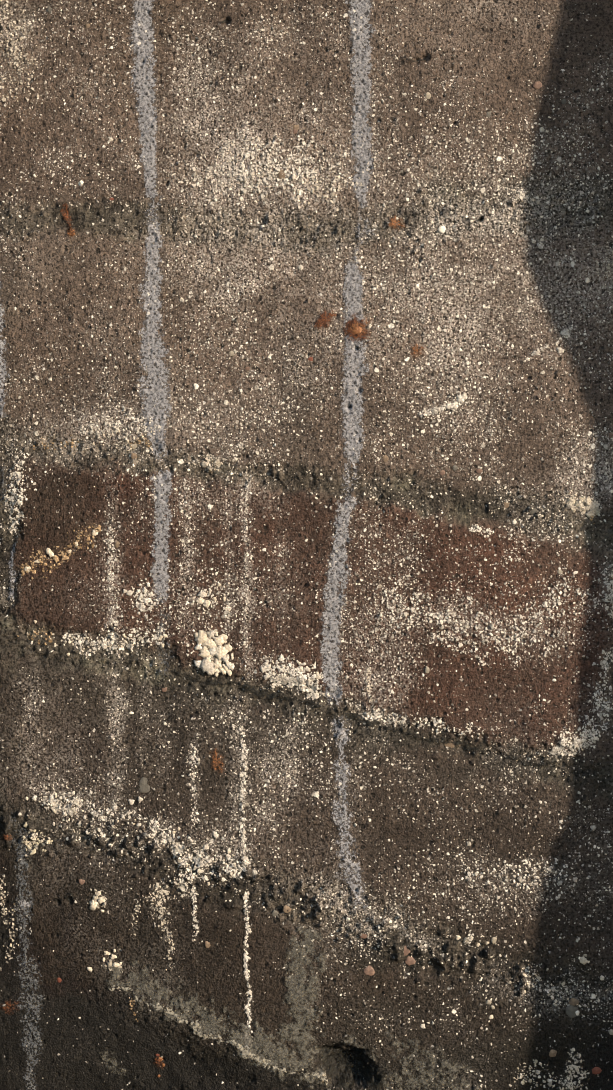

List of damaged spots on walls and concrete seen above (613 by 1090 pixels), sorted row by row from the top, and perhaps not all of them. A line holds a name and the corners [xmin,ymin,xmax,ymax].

water stain [0,0,379,705]
corrosion [316,310,371,341]
water stain [0,727,259,1090]
water stain [331,661,480,911]
efflorescence [363,564,613,666]
efflorescence [550,648,613,761]